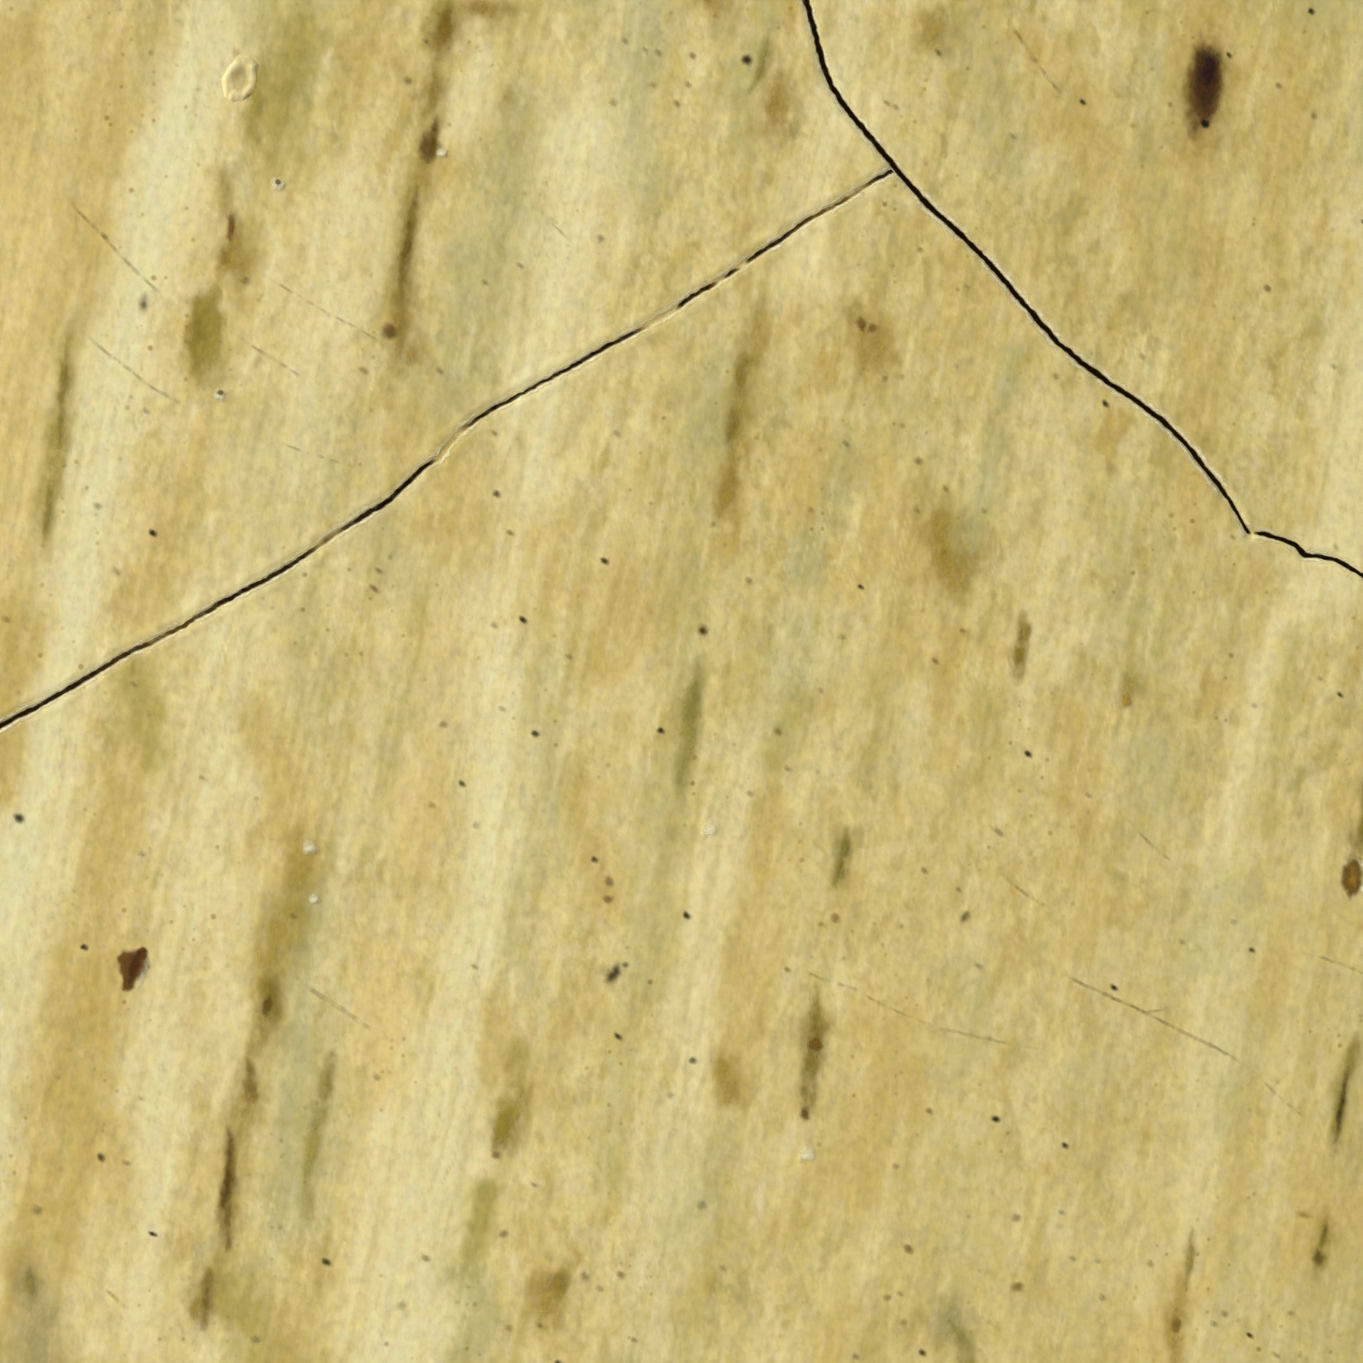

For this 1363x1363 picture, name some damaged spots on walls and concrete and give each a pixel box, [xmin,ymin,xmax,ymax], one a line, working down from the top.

crack [0,0,1363,733]